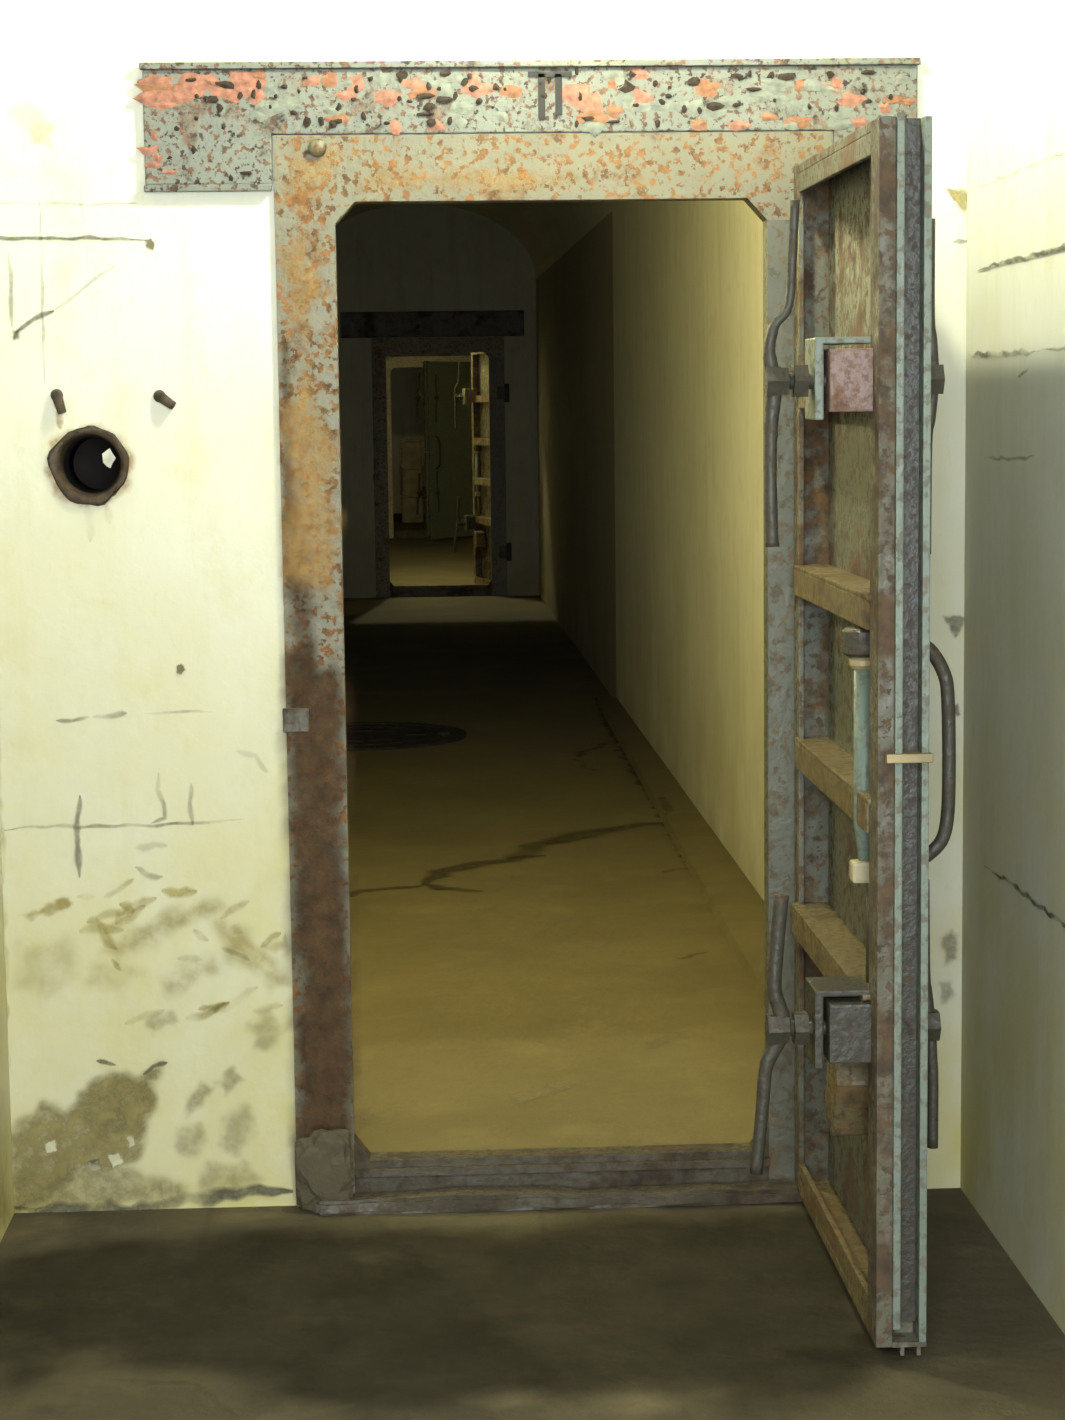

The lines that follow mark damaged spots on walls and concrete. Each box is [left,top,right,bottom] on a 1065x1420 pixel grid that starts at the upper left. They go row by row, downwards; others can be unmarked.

rust [287,512,353,1138]
crack [350,697,682,897]
crack [984,866,1065,927]
peeling [11,1060,179,1209]